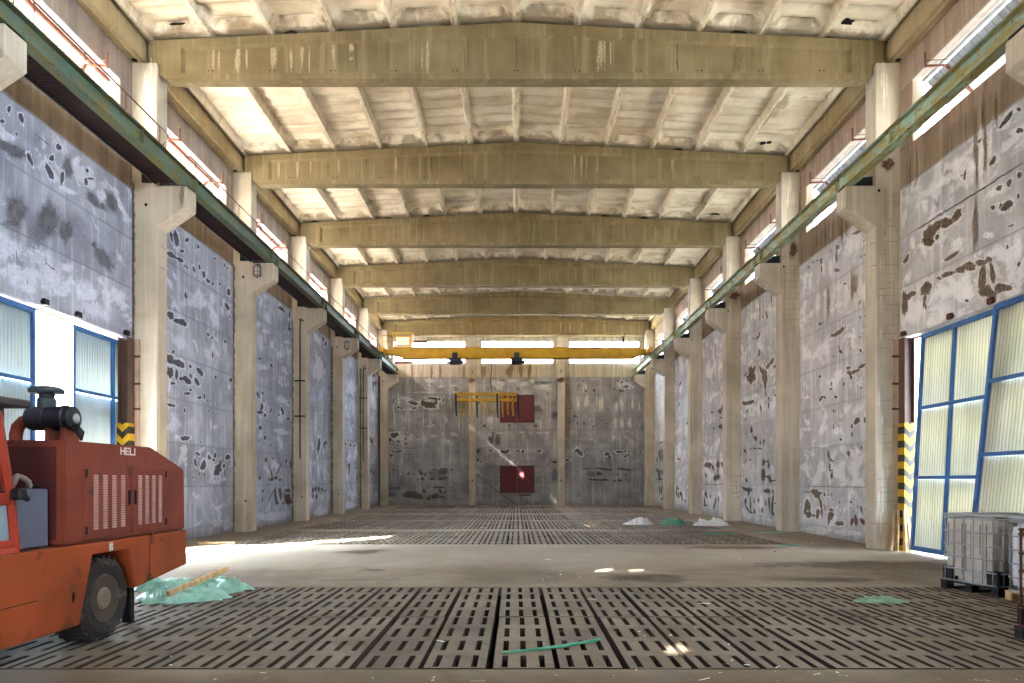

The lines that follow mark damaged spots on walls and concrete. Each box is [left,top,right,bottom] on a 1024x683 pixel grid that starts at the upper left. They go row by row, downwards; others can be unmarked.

damp [0,105,126,323]